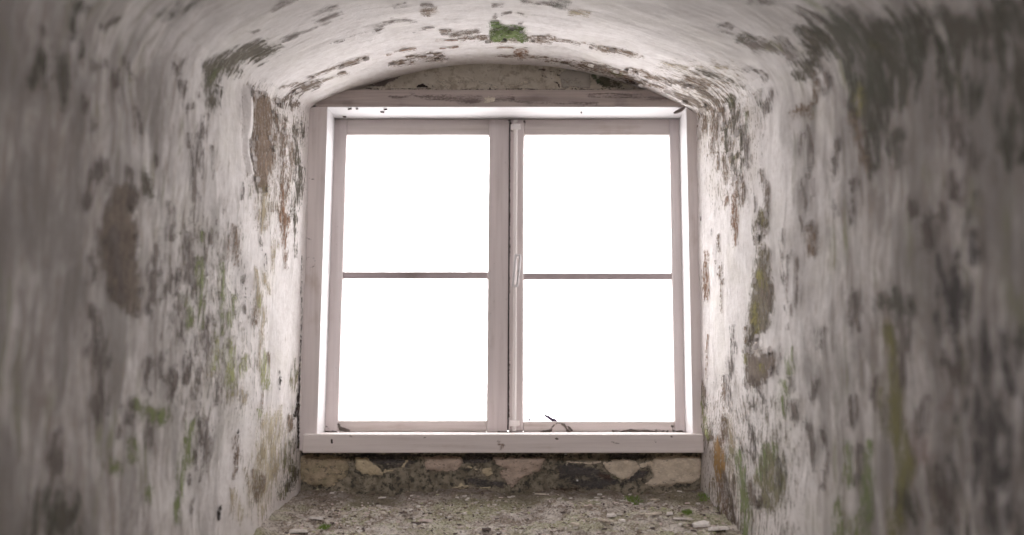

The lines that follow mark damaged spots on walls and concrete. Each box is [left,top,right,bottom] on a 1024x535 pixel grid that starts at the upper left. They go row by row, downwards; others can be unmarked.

peeling [242,56,370,235]
flaking render [369,29,748,173]
water stain [86,303,112,428]
water stain [141,153,286,520]
water stain [708,326,787,530]
flaking render [742,169,776,404]
water stain [776,353,828,489]
water stain [803,221,820,259]
water stain [846,374,878,429]